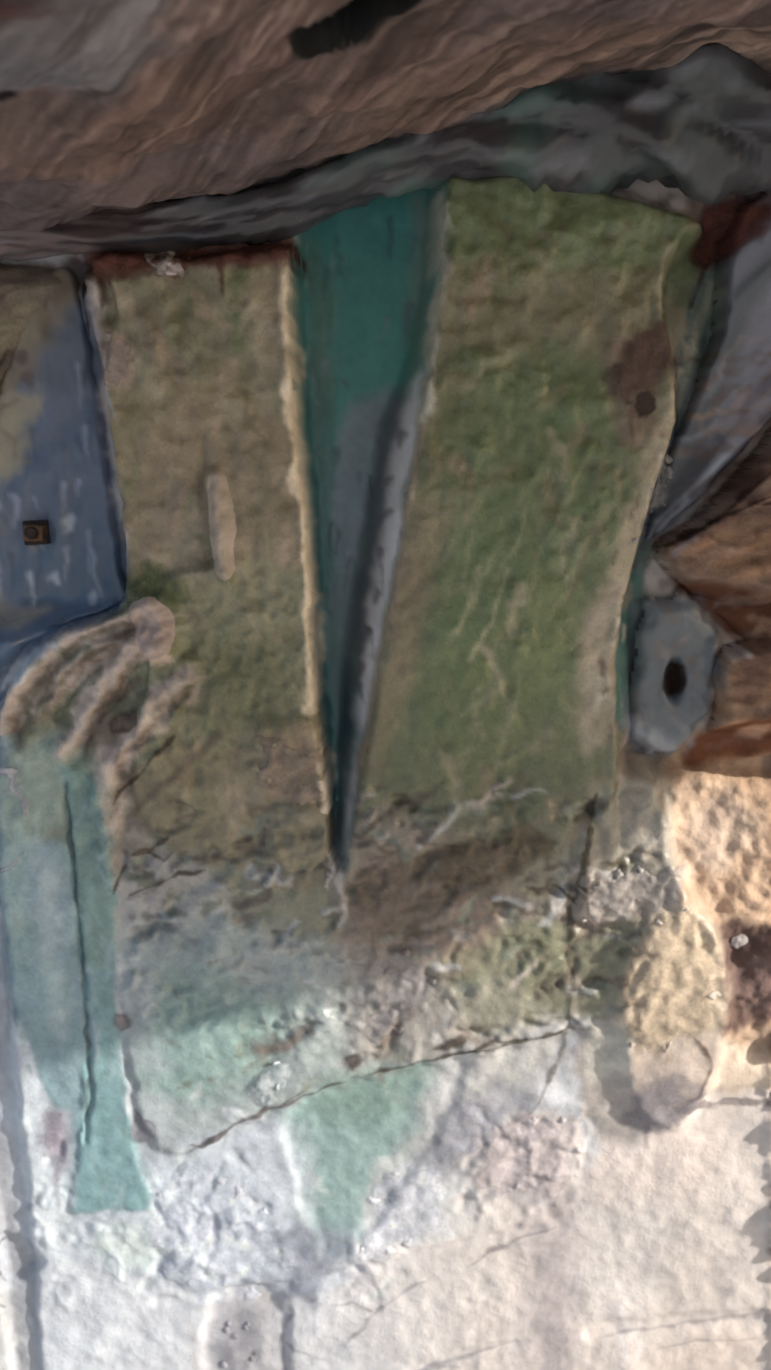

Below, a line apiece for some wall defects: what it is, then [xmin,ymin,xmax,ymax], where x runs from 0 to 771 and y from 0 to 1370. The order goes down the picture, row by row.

rust [690,197,771,281]
crack [560,796,597,972]
crack [378,1030,567,1083]
crack [194,1083,340,1148]